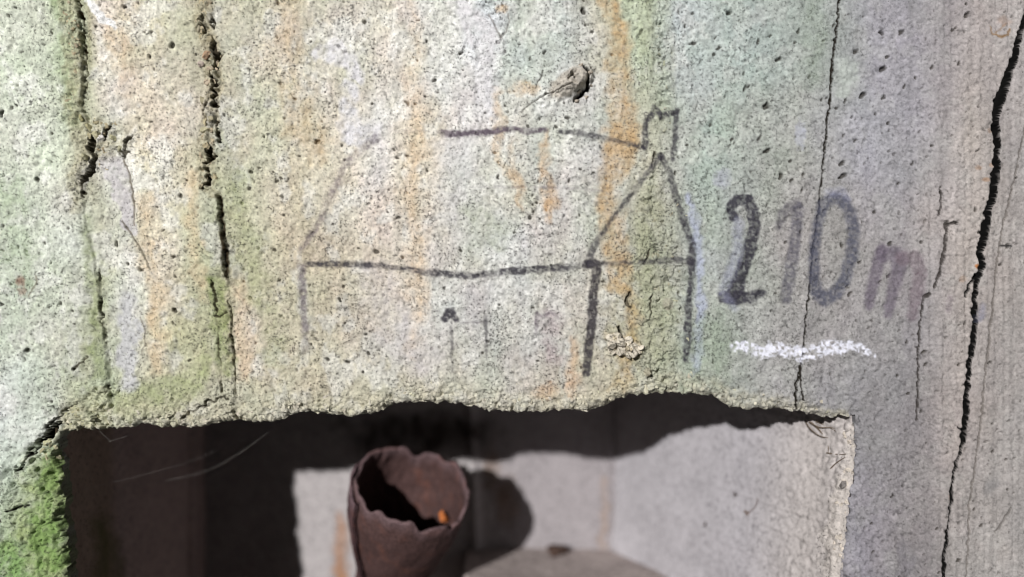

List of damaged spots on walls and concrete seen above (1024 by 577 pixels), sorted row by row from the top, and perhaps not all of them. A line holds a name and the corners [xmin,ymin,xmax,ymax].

crack [74,0,135,199]
crack [179,0,237,425]
spalling [19,185,857,577]
rust [592,0,642,340]
crack [793,287,811,411]
crack [818,0,842,197]
crack [915,9,1024,577]